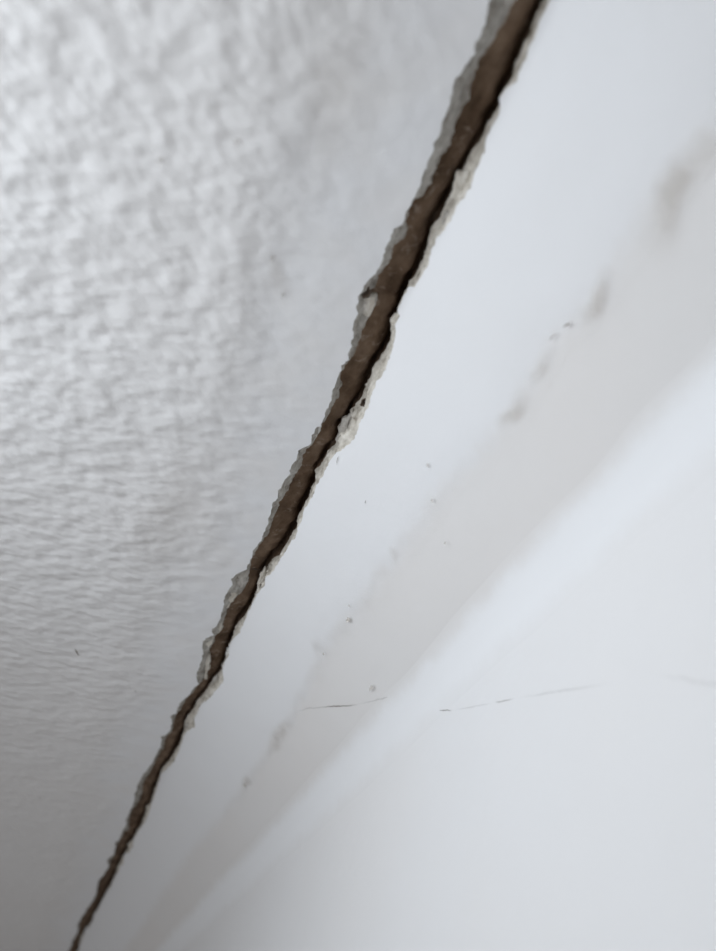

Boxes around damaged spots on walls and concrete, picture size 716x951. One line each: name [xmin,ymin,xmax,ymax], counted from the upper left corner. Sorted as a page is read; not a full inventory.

crack [68,0,550,951]